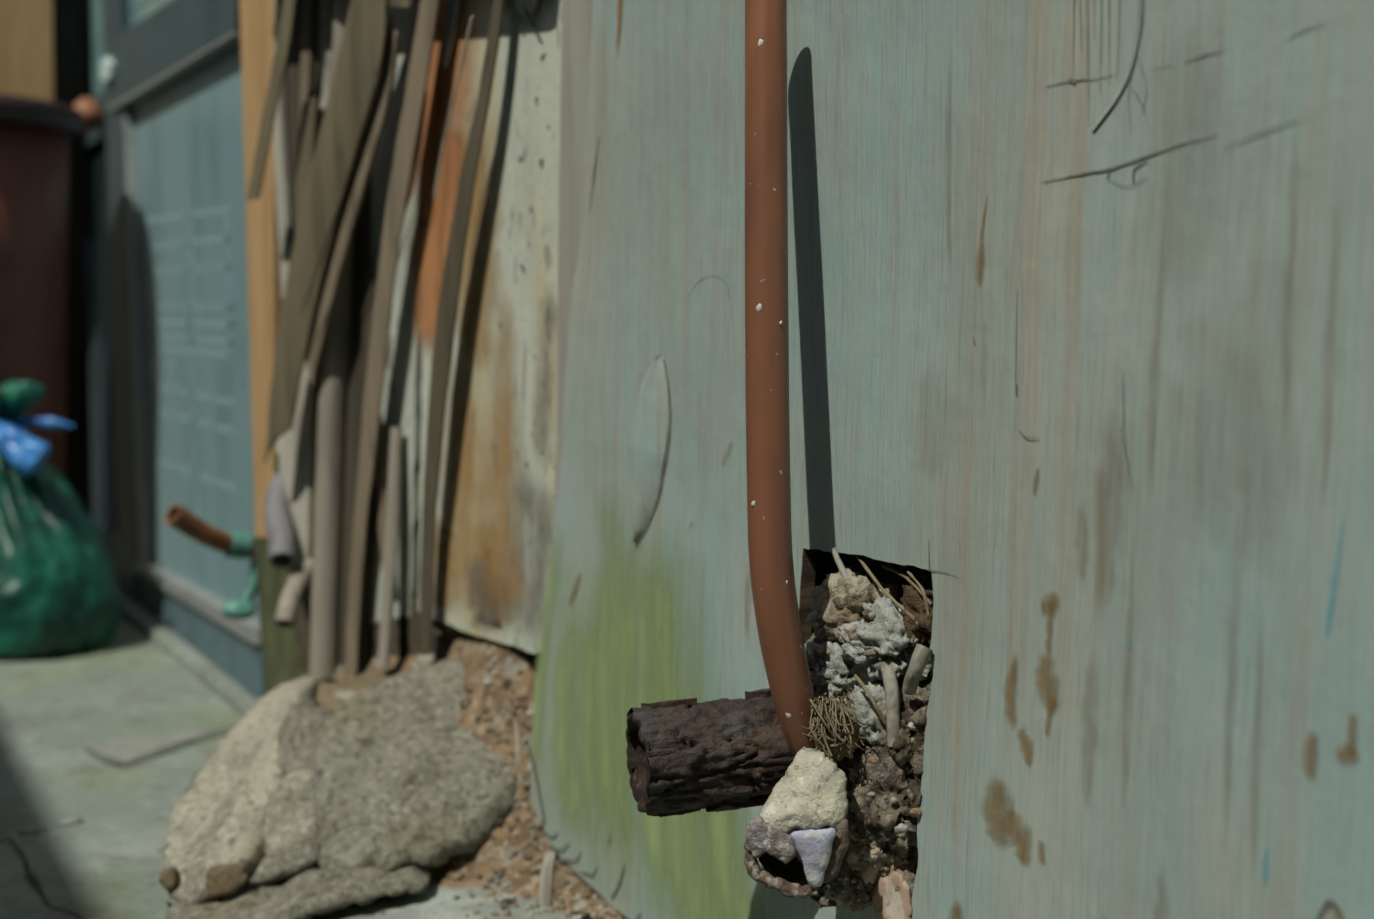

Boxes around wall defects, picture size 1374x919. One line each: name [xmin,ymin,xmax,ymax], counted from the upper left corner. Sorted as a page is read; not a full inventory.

crack [1041,0,1307,186]
rust [413,0,485,351]
rust [434,380,515,621]
spalling [827,552,921,604]
spalling [898,669,933,790]
rust [1007,662,1031,763]
rust [1039,596,1056,731]
spalling [793,787,918,919]
rust [987,784,1044,861]